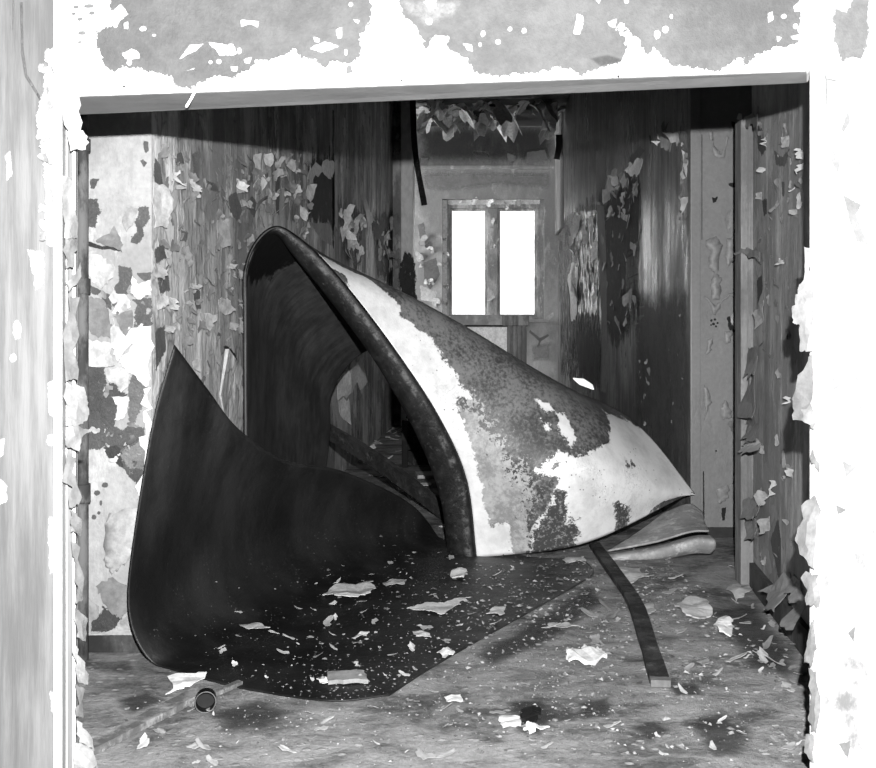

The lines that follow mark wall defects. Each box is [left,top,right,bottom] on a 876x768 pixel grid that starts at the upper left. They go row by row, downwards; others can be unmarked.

peeling [27,0,540,768]
peeling [416,99,566,163]
water stain [594,56,621,65]
peeling [559,121,688,393]
peeling [710,314,735,332]
peeling [724,207,735,233]
peeling [731,113,806,266]
peeling [728,247,817,454]
peeling [0,479,8,505]
peeling [726,434,821,767]